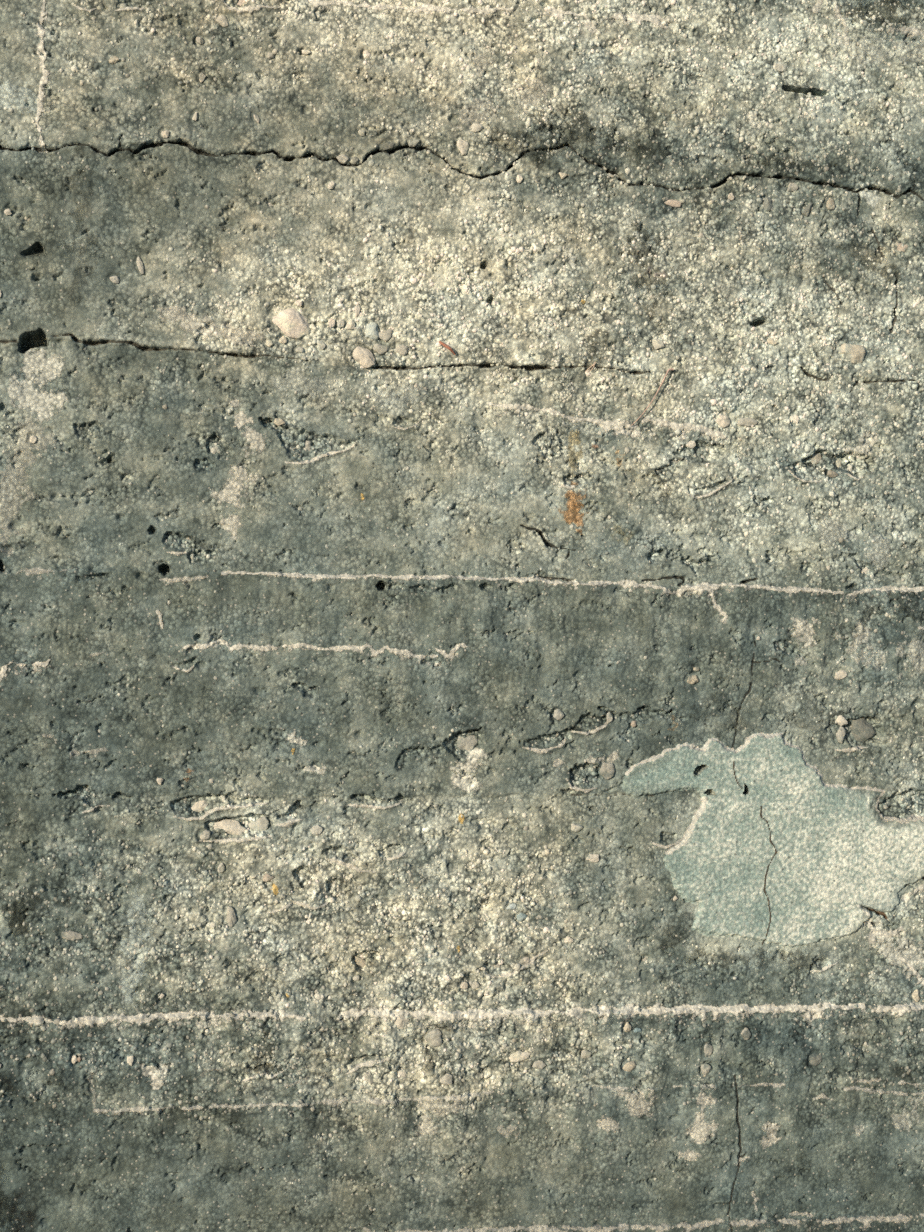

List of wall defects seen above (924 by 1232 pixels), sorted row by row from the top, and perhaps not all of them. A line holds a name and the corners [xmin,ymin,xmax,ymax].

crack [0,134,924,334]
crack [53,333,309,361]
crack [372,364,651,375]
crack [800,366,916,392]
corrosion [559,483,586,532]
crack [642,576,685,586]